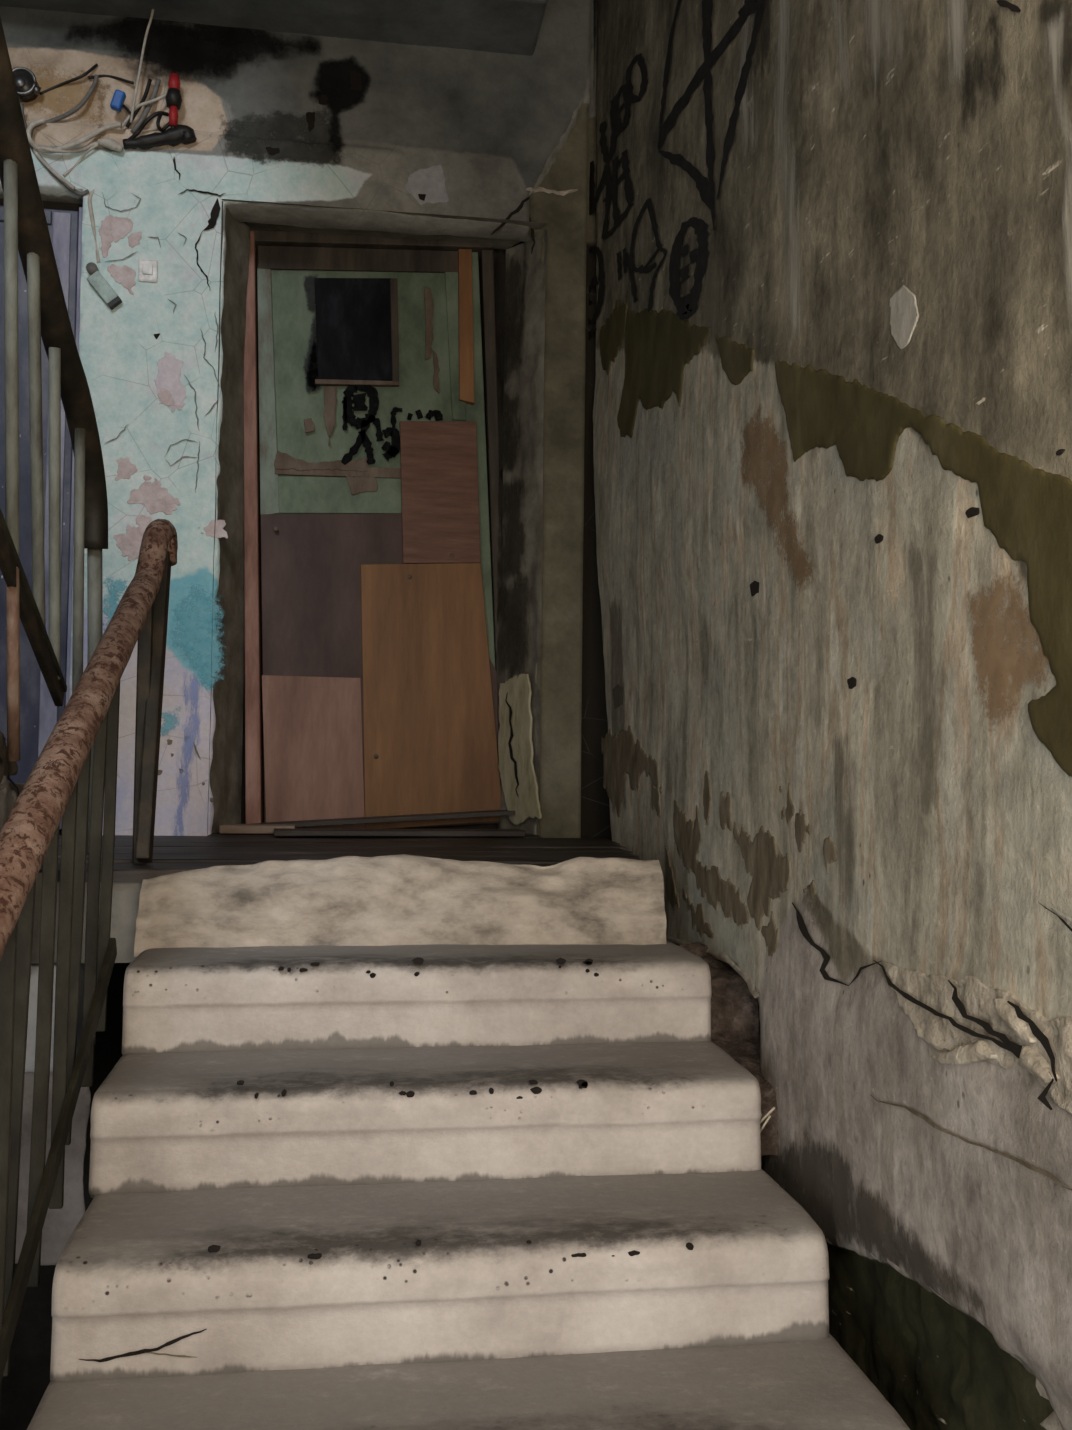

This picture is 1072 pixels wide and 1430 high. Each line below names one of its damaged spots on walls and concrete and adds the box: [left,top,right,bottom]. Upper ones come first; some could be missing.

damp [224,57,370,165]
damp [739,0,800,333]
damp [948,0,1003,122]
damp [1041,0,1072,148]
peeling [599,300,754,438]
peeling [890,285,919,349]
peeling [775,361,1072,777]
flaking render [498,674,542,825]
crack [792,902,881,986]
crack [1038,902,1072,932]
crack [870,1094,1072,1191]
crack [79,1329,207,1362]